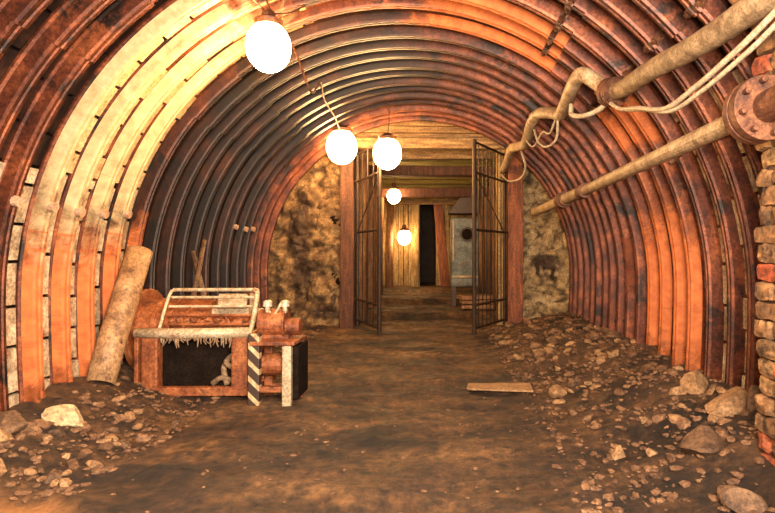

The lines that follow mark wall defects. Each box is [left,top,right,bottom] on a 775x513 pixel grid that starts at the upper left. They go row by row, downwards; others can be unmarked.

rust [404,0,571,72]
rust [597,95,661,153]
rust [21,220,143,402]
rust [620,231,636,294]
rust [637,194,702,370]